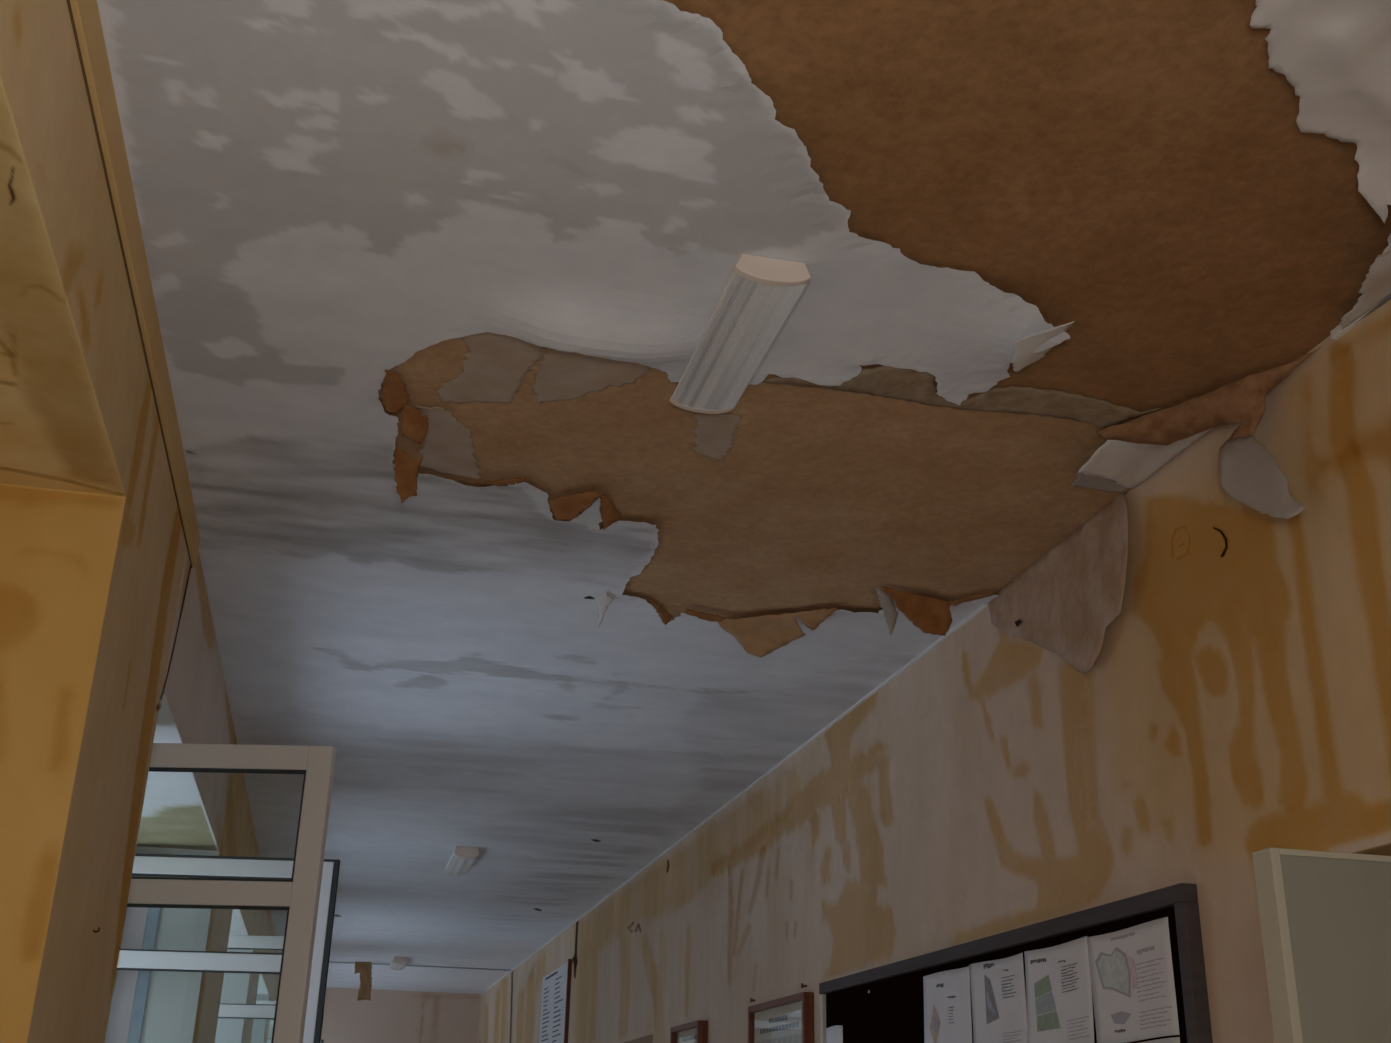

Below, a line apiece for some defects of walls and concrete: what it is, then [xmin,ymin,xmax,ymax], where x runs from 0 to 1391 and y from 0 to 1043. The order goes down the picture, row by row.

peeling [378,0,1391,673]